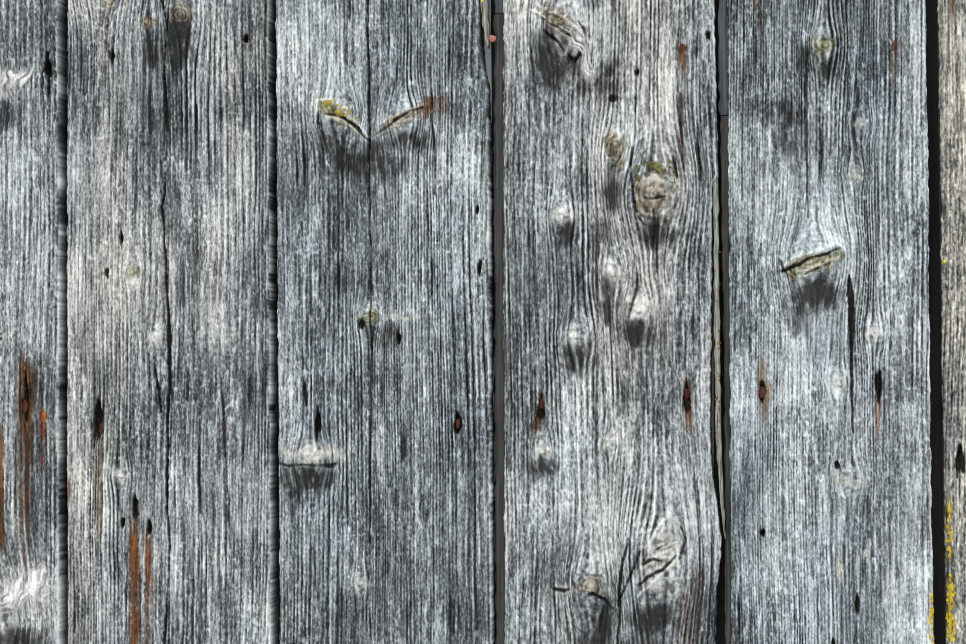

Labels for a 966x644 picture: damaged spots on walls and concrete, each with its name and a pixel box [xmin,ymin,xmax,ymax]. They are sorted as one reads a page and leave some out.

crack [847,275,855,433]
rust [19,355,46,525]
rust [129,518,153,644]